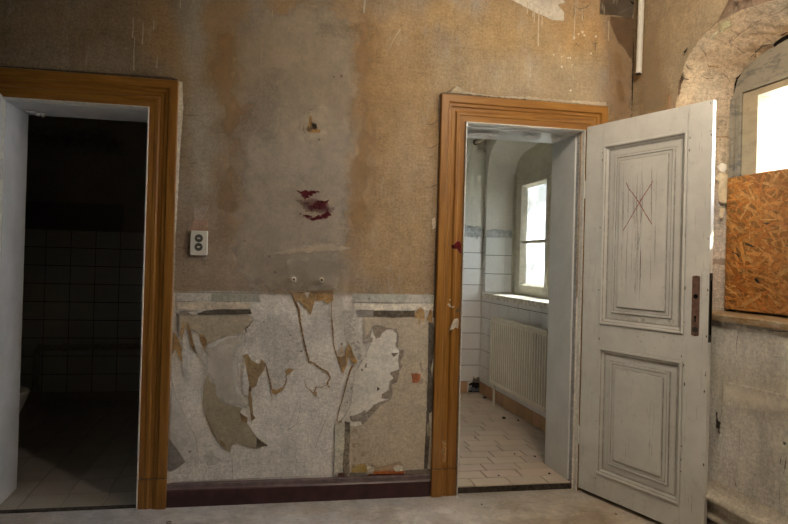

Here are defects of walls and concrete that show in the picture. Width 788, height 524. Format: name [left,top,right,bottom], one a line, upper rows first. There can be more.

peeling [352,294,434,318]